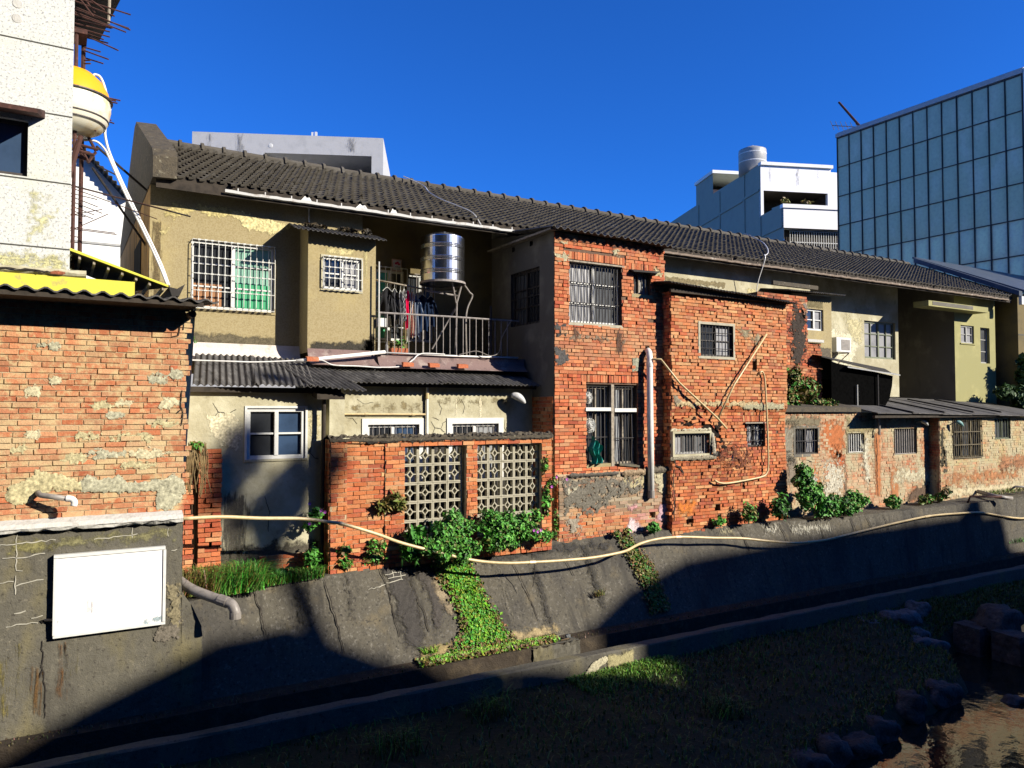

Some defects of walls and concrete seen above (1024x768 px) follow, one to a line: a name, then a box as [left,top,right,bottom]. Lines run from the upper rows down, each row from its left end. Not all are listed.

leakage [0,192,66,270]